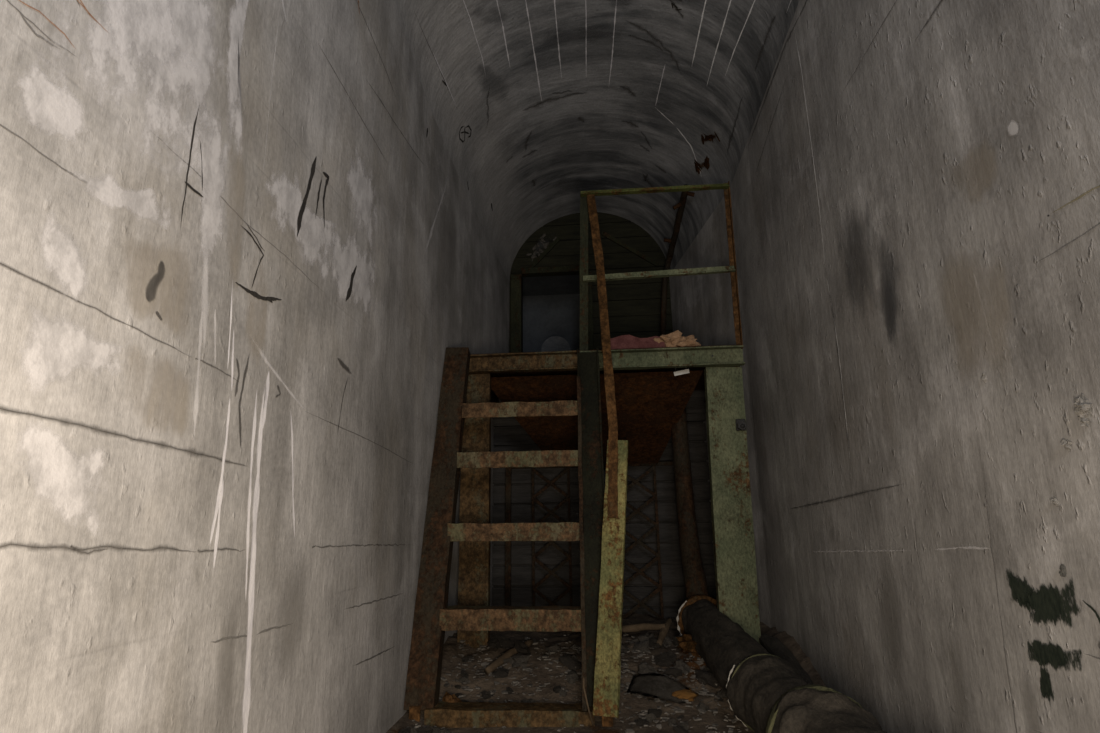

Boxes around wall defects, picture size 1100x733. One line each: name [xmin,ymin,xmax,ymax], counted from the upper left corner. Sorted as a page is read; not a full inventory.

crack [0,263,236,380]
crack [0,408,241,465]
damp [194,243,234,567]
crack [0,544,243,554]
damp [243,372,269,733]